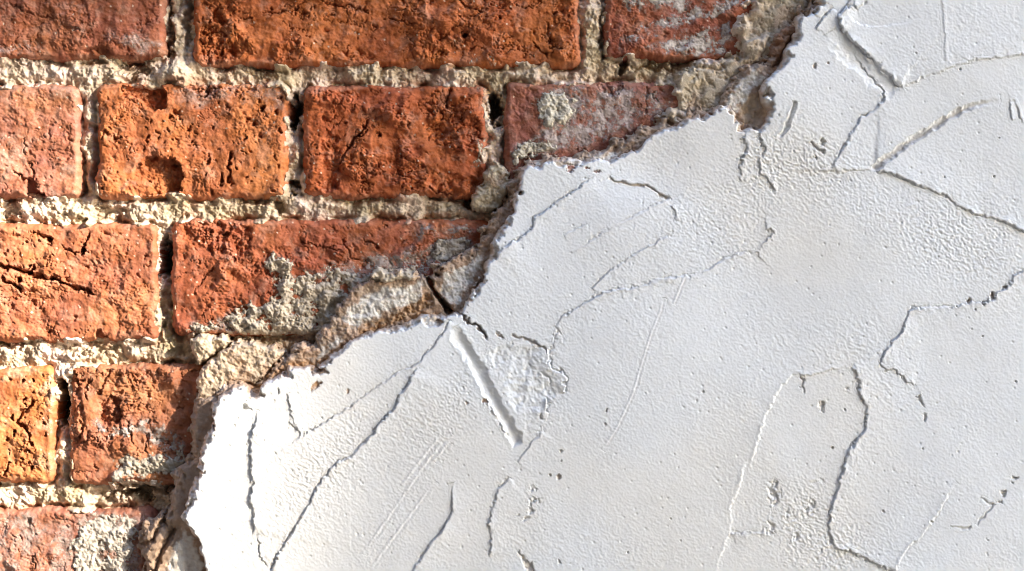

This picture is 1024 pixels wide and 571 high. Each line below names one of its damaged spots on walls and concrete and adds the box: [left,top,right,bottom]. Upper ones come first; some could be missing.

spalling [195,6,241,68]
crack [770,30,793,68]
spalling [117,83,186,200]
crack [217,151,237,188]
crack [607,175,681,222]
crack [734,129,778,193]
crack [808,137,829,160]
spalling [177,218,258,264]
spalling [372,290,436,330]
spalling [69,368,128,455]
crack [274,274,570,457]
spalling [446,323,569,450]